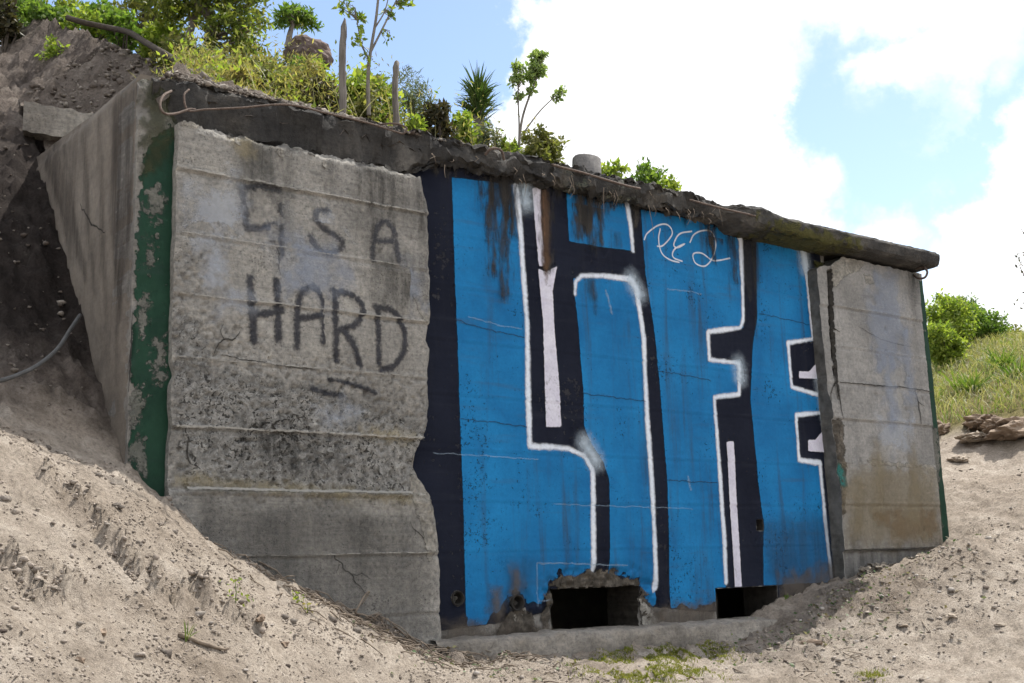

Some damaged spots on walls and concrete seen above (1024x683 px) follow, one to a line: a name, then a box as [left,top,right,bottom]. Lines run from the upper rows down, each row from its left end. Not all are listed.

peeling [141,182,169,277]
water stain [480,175,517,299]
water stain [542,186,651,249]
peeling [128,292,168,478]
crack [760,269,932,424]
crack [334,555,370,596]
spalling [497,568,657,635]